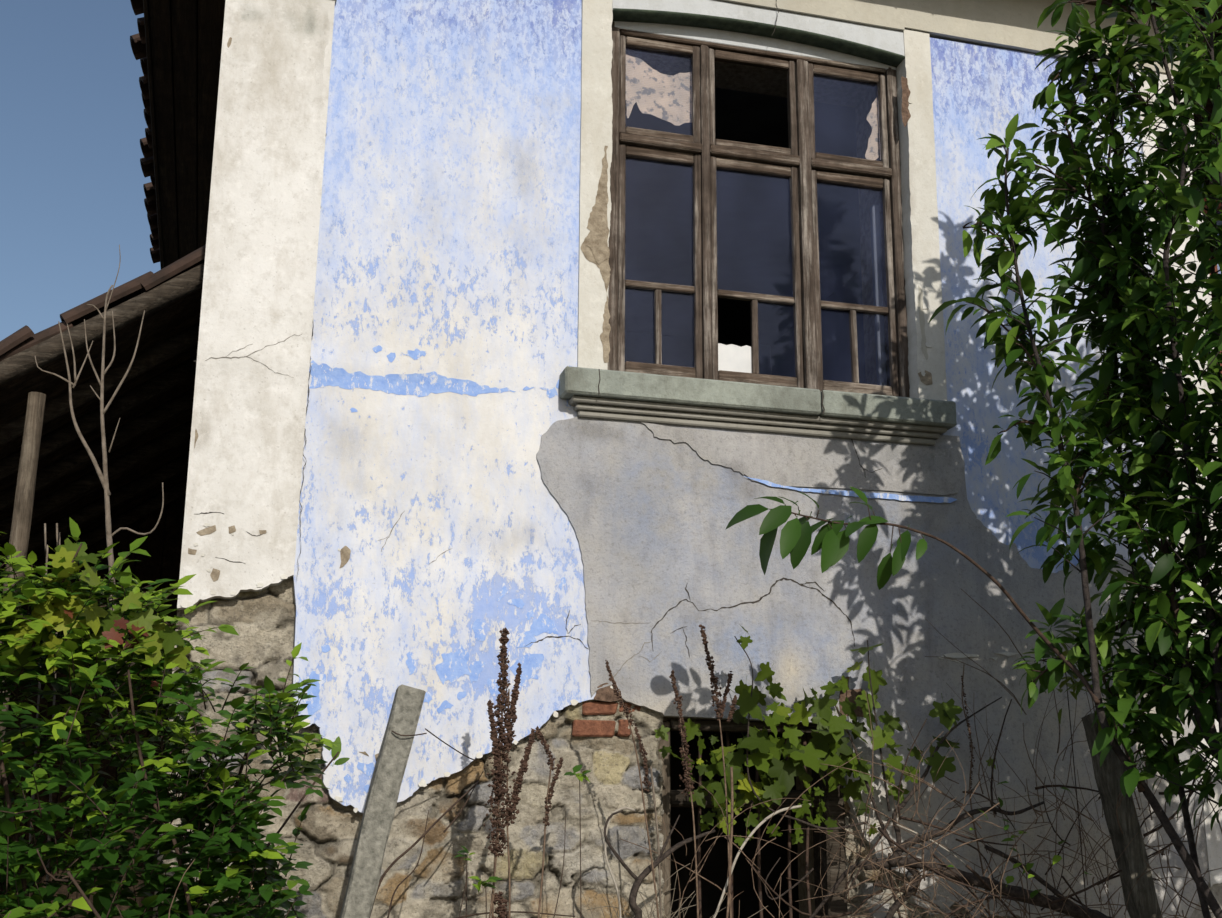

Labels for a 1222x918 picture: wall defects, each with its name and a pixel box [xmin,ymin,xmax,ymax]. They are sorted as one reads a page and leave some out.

flaking render [581,146,611,363]
crack [200,324,314,574]
spalling [188,523,236,595]
peeling [406,652,416,675]
flaking render [570,683,641,737]
crack [524,577,855,682]
spalling [839,676,864,717]